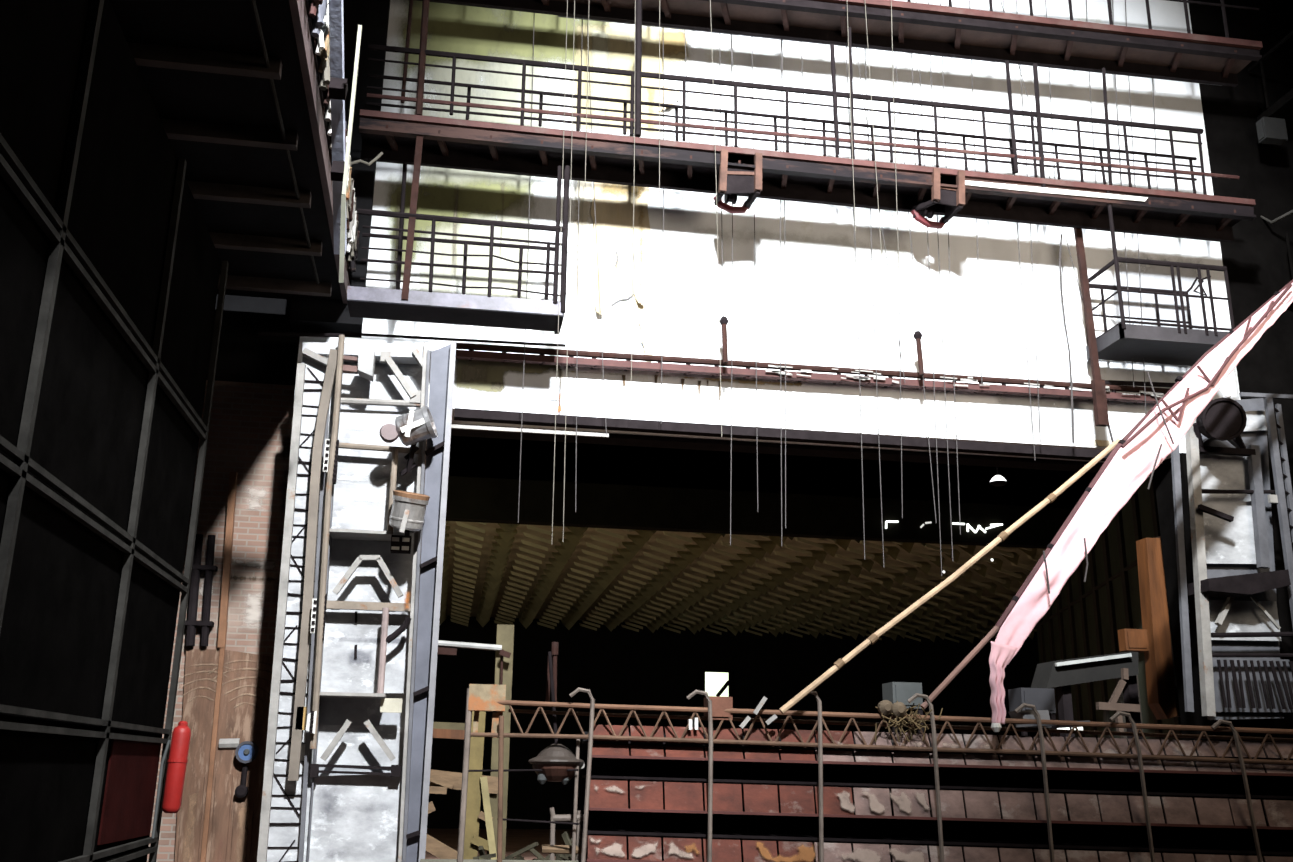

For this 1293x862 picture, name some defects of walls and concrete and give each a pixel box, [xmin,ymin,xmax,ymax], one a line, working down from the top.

peeling [591,182,654,355]
peeling [837,791,929,813]
peeling [590,838,693,858]
peeling [842,848,925,862]